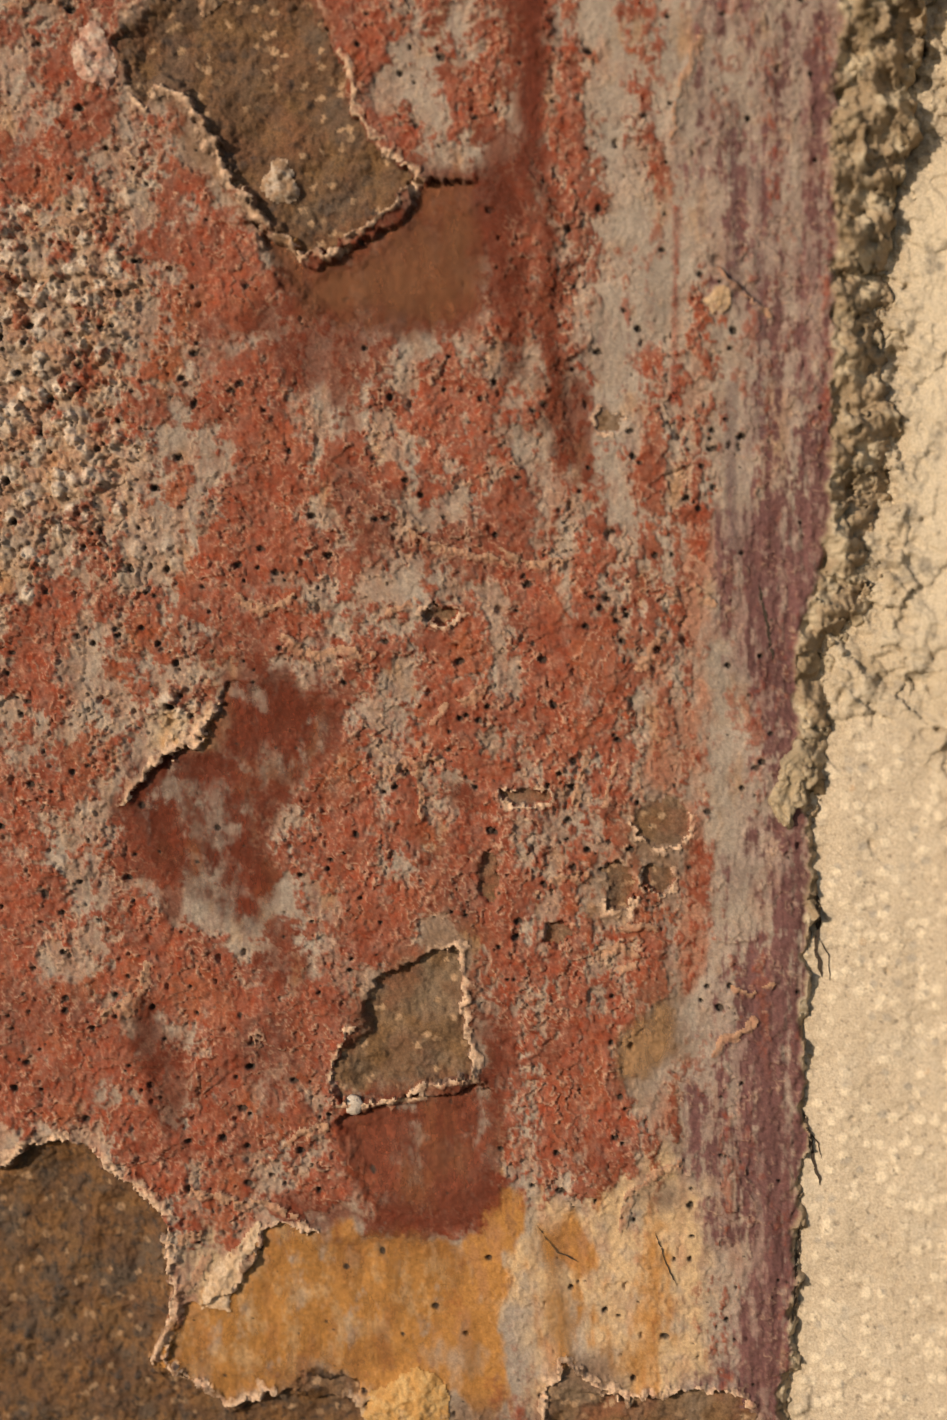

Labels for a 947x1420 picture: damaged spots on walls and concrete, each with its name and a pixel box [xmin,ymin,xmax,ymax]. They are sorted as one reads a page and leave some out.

spalling [112,0,425,265]
flaking render [232,592,295,617]
flaking render [276,633,376,664]
peeling [115,677,326,931]
spalling [281,939,499,1212]
spalling [0,1127,459,1420]